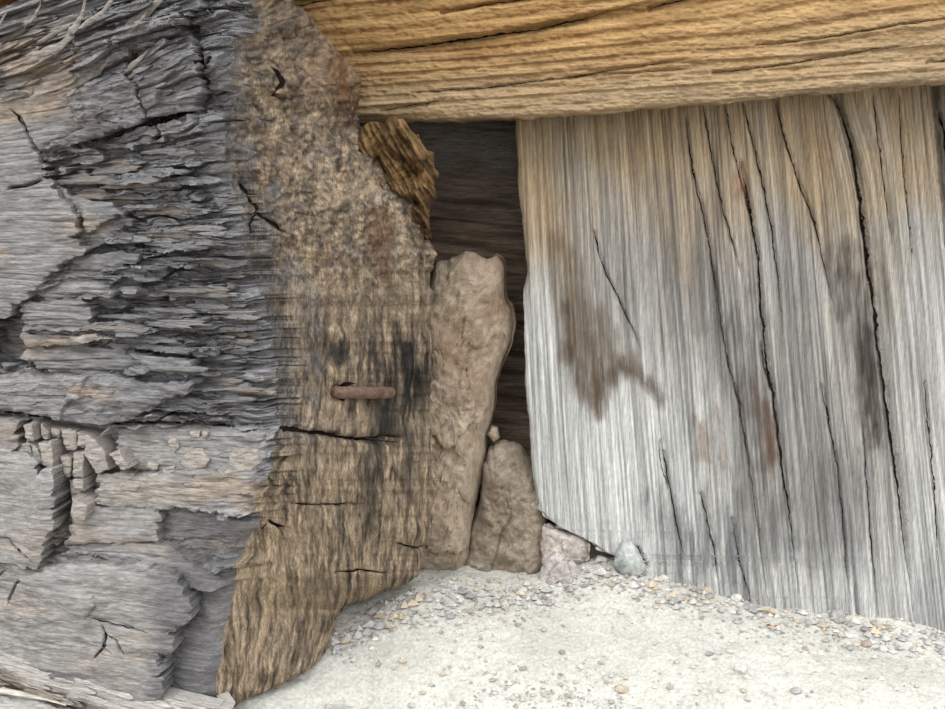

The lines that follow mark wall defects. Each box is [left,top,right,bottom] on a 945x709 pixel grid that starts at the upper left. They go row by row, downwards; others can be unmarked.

peeling [15,0,114,65]
peeling [59,0,163,91]
crack [356,0,683,53]
crack [381,18,945,111]
crack [776,102,837,316]
peeling [56,147,279,401]
crack [686,104,800,608]
crack [830,94,913,611]
spalling [17,417,211,524]
spalling [221,447,263,478]
crack [116,411,404,444]
crack [659,438,686,570]